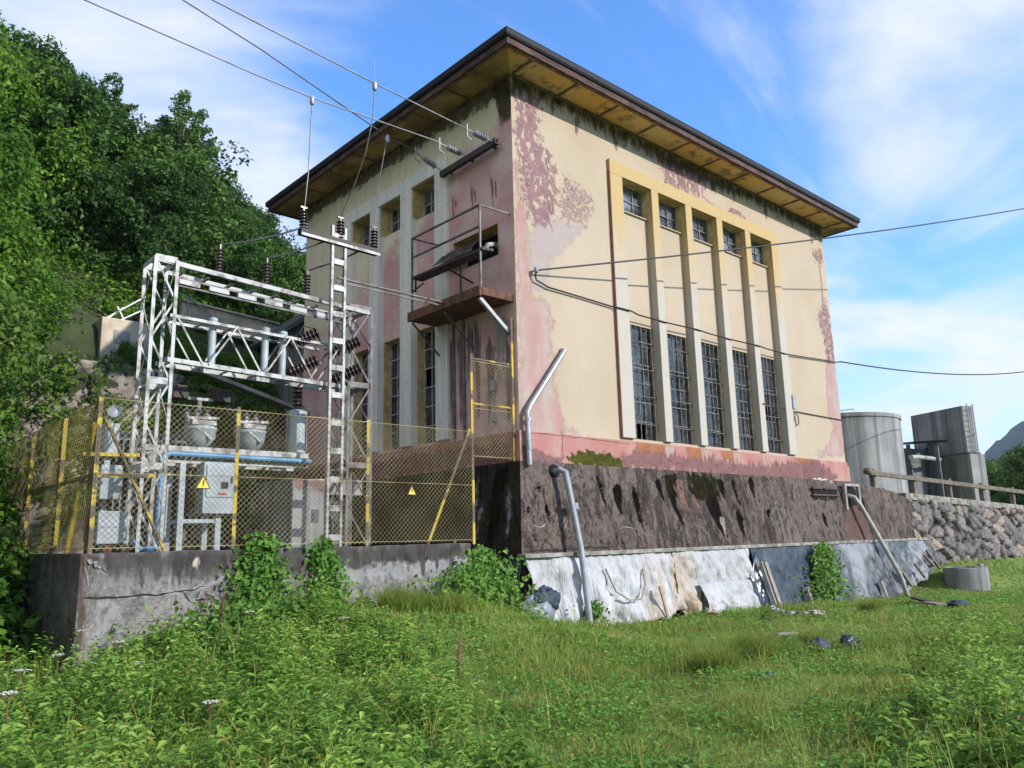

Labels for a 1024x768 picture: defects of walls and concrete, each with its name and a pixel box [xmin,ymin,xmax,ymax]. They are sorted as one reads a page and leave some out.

peeling [512,90,595,228]
water stain [307,77,822,243]
flaking render [661,160,700,196]
peeling [819,298,835,362]
crack [83,564,205,603]